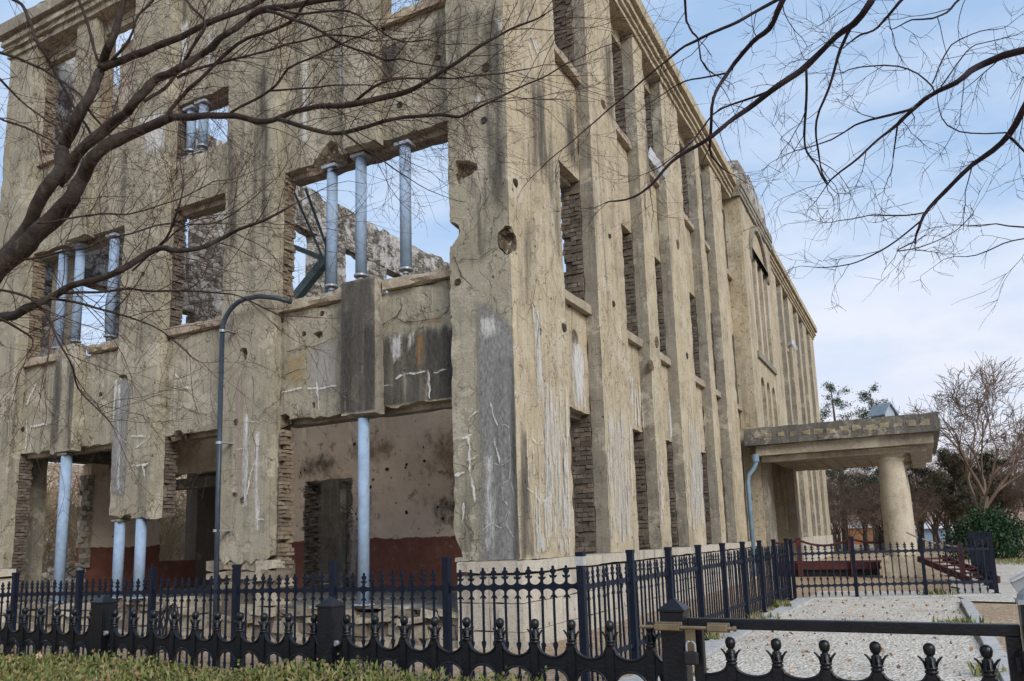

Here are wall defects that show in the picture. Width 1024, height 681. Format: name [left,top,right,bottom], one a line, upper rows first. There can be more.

spalling [456,163,477,185]
spalling [498,227,517,254]
crack [382,307,449,325]
damp [481,318,495,336]
damp [341,278,453,413]
crack [385,369,446,398]
crack [238,336,337,495]
crack [455,403,549,536]
damp [486,457,494,548]